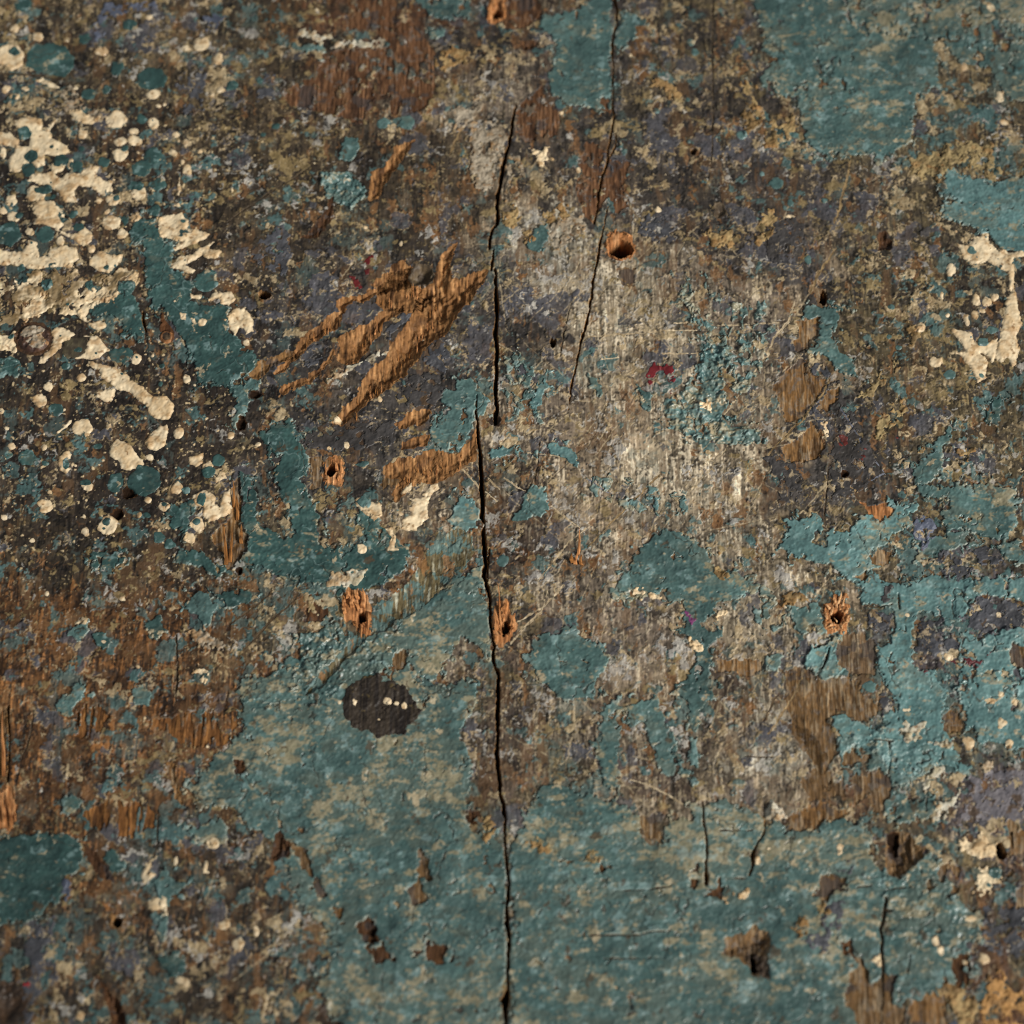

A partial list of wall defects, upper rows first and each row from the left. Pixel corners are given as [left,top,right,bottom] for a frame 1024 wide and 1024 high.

peeling [255,0,472,123]
crack [474,105,517,1024]
peeling [0,208,1024,1024]
crack [560,0,618,410]